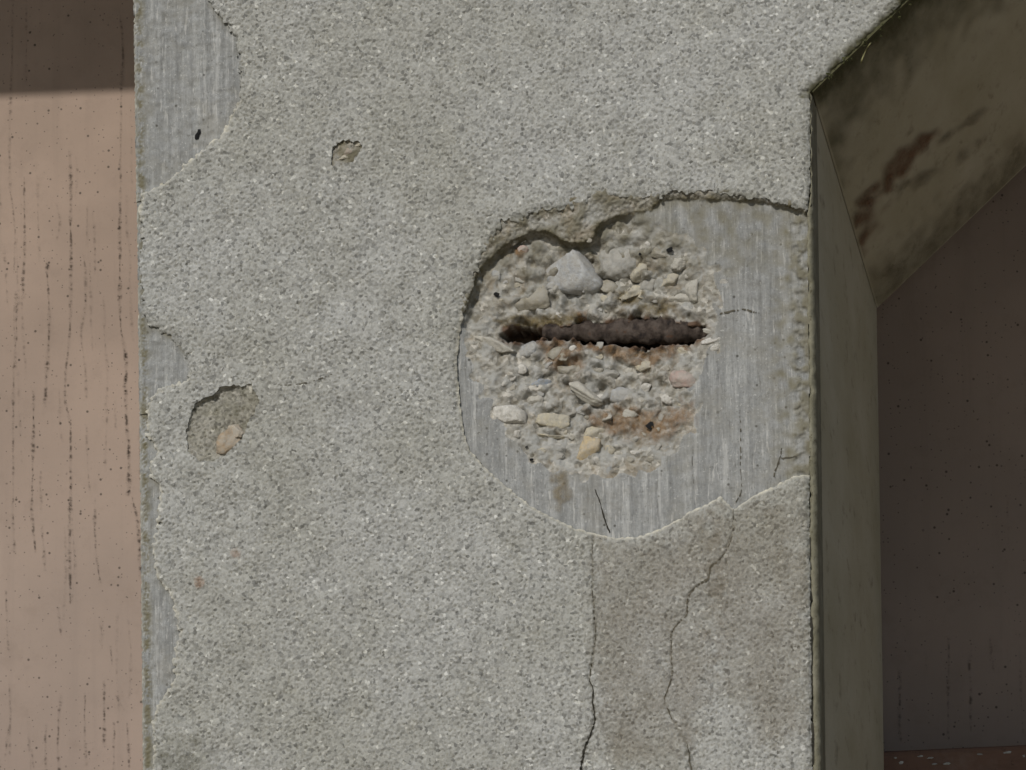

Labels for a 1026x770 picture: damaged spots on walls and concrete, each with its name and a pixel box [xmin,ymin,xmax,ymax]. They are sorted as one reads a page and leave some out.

peeling [133,0,242,203]
spalling [332,140,362,166]
peeling [138,318,191,415]
spalling [186,384,259,461]
corrosion [544,342,674,369]
spalling [457,188,810,538]
peeling [139,430,180,770]
crack [579,489,610,770]
crack [664,416,742,719]